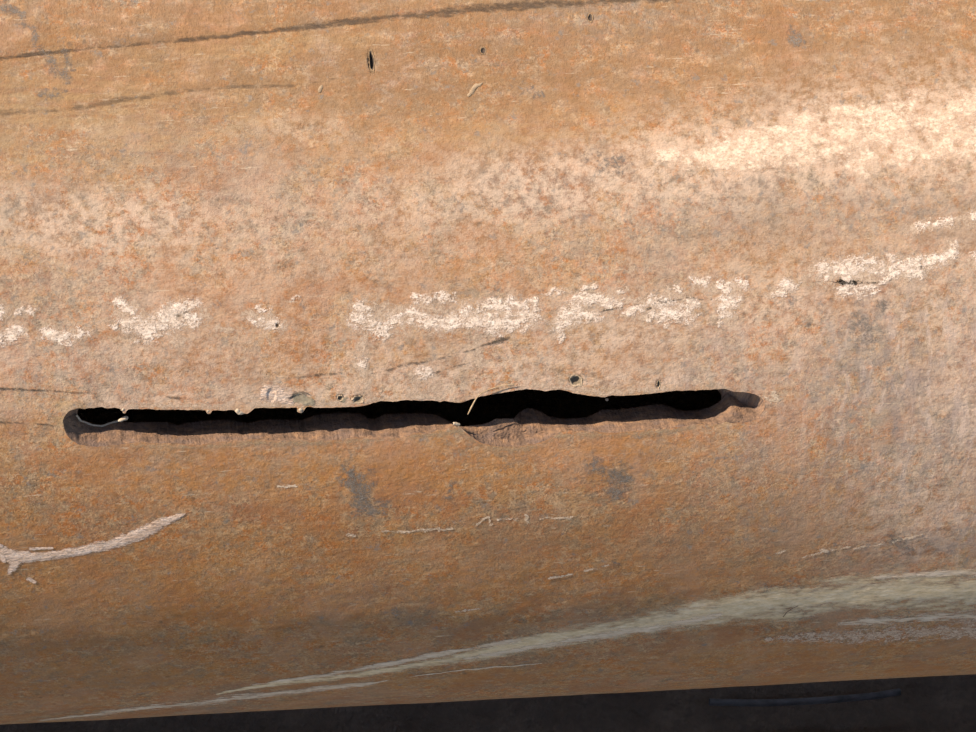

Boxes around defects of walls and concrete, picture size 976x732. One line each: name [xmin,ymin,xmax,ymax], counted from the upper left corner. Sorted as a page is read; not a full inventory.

crack [1,386,75,394]